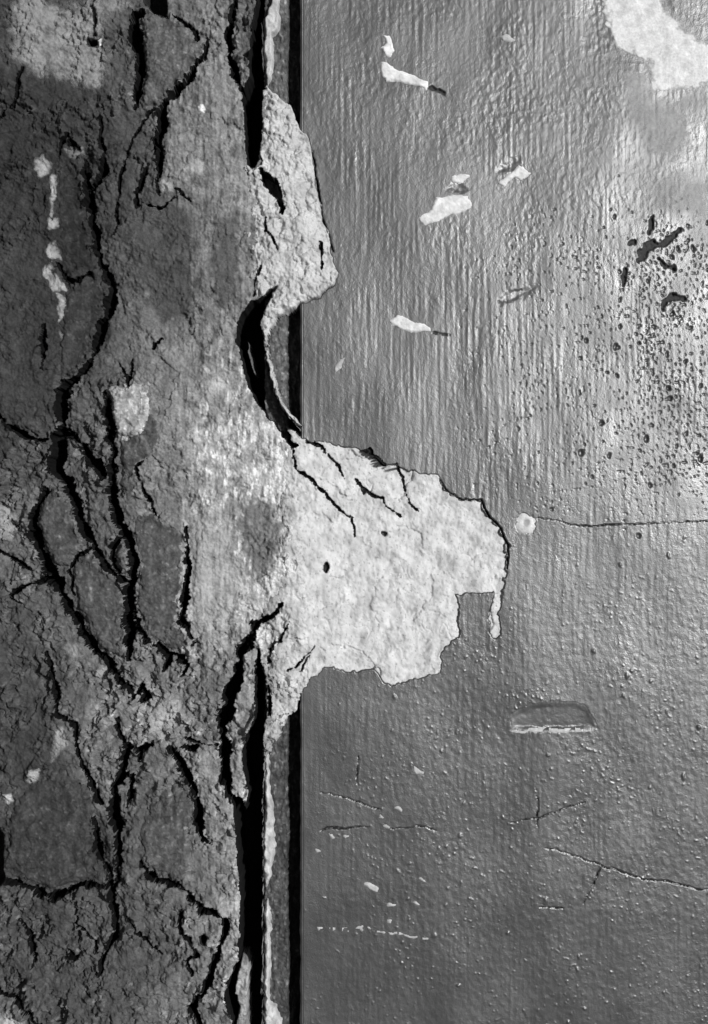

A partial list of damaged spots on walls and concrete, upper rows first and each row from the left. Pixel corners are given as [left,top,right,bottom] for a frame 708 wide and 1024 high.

peeling [380,35,445,95]
spalling [494,155,531,187]
spalling [244,85,507,755]
crack [0,0,419,1024]
crack [538,517,708,527]
crack [513,795,586,824]
crack [549,848,704,909]